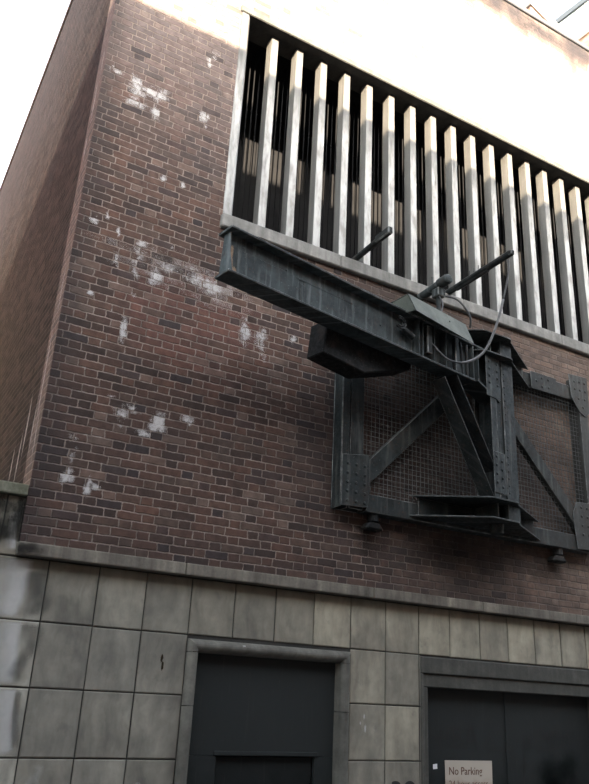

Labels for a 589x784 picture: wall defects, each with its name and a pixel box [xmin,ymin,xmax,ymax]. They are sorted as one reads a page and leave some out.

water stain [100,50,171,119]
water stain [88,228,268,362]
water stain [138,409,168,438]
water stain [60,435,101,497]